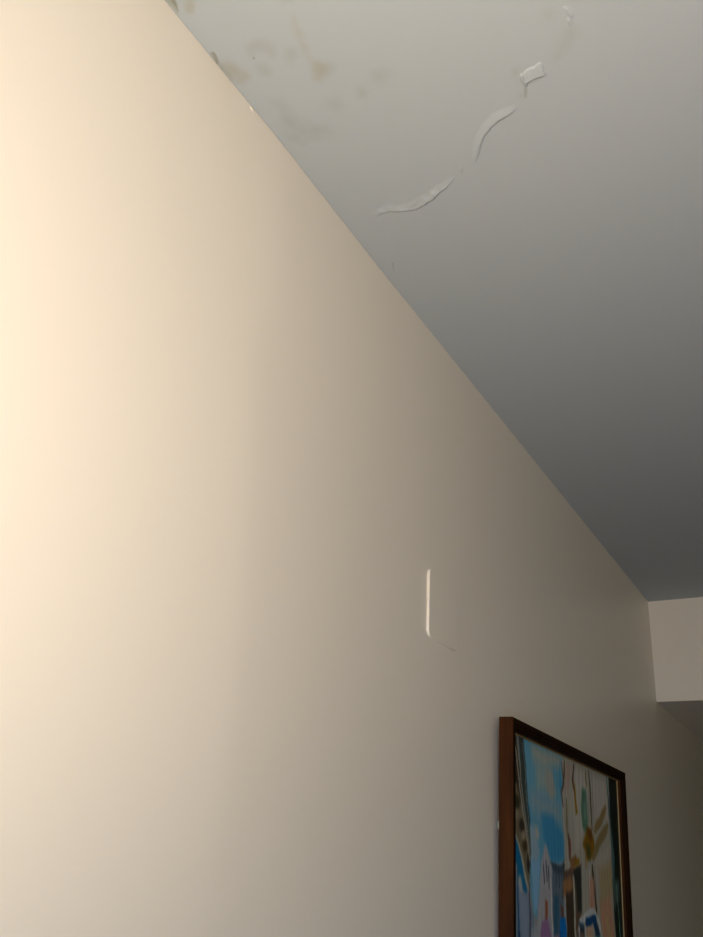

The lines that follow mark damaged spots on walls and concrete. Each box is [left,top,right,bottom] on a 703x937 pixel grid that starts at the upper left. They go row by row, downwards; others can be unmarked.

leakage [218,11,351,150]